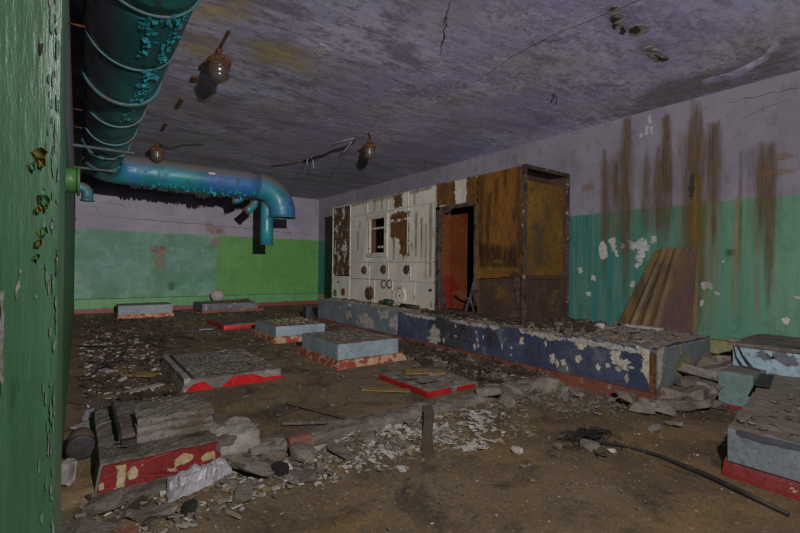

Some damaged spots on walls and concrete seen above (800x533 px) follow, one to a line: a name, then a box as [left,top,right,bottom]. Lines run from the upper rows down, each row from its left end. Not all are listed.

crack [440,0,452,54]
spalling [609,6,649,37]
peeling [120,14,189,122]
spalling [642,45,669,62]
peeling [598,236,657,269]
peeling [345,310,445,345]
spalling [450,319,503,350]
spalling [501,328,665,389]